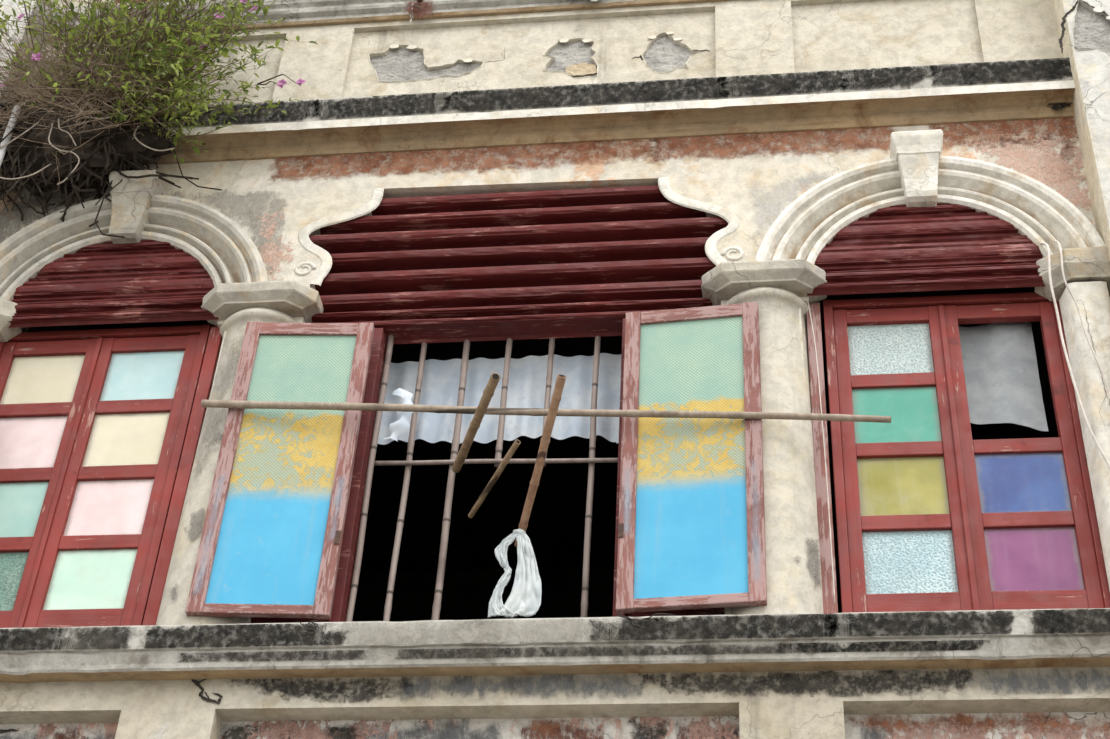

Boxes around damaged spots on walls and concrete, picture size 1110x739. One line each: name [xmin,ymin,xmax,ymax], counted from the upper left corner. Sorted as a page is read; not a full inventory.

spalling [1071,0,1110,54]
spalling [368,44,485,83]
spalling [543,37,599,79]
spalling [632,31,709,73]
damp [156,58,1072,127]
damp [0,626,131,651]
damp [144,610,1015,662]
damp [1031,609,1110,633]
crack [191,679,223,704]
damp [231,669,1110,703]
peeling [685,715,740,739]
peeling [862,721,1110,739]